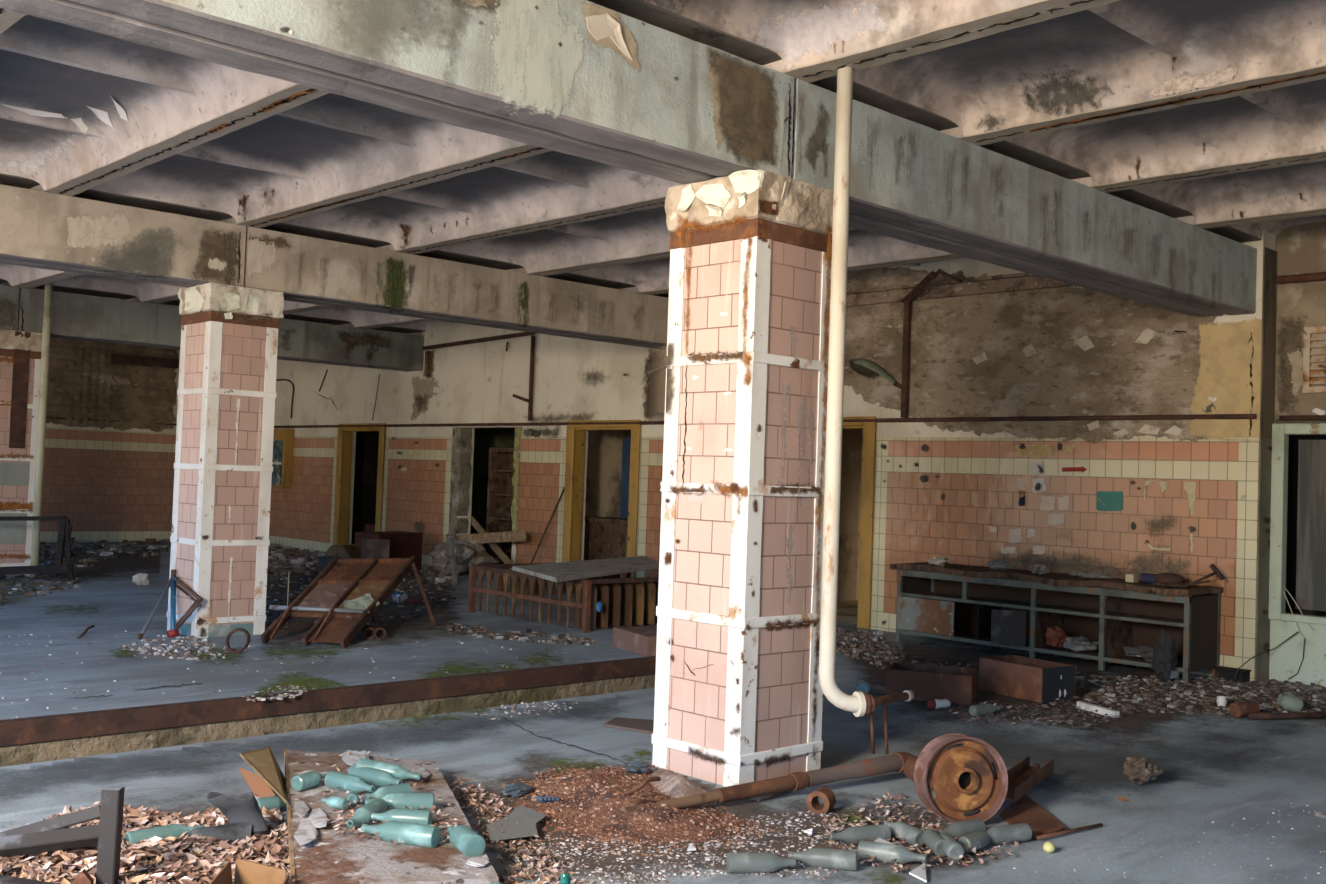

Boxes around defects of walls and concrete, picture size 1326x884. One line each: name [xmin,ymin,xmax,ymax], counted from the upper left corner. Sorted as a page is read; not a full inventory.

peeling [581,2,640,72]
leakage [693,0,889,176]
leakage [980,116,999,132]
leakage [1019,73,1109,115]
peeling [677,170,764,217]
leakage [102,230,175,278]
leakage [193,230,239,284]
spalling [46,338,179,432]
spalling [844,267,1217,506]
corrosion [665,200,832,754]